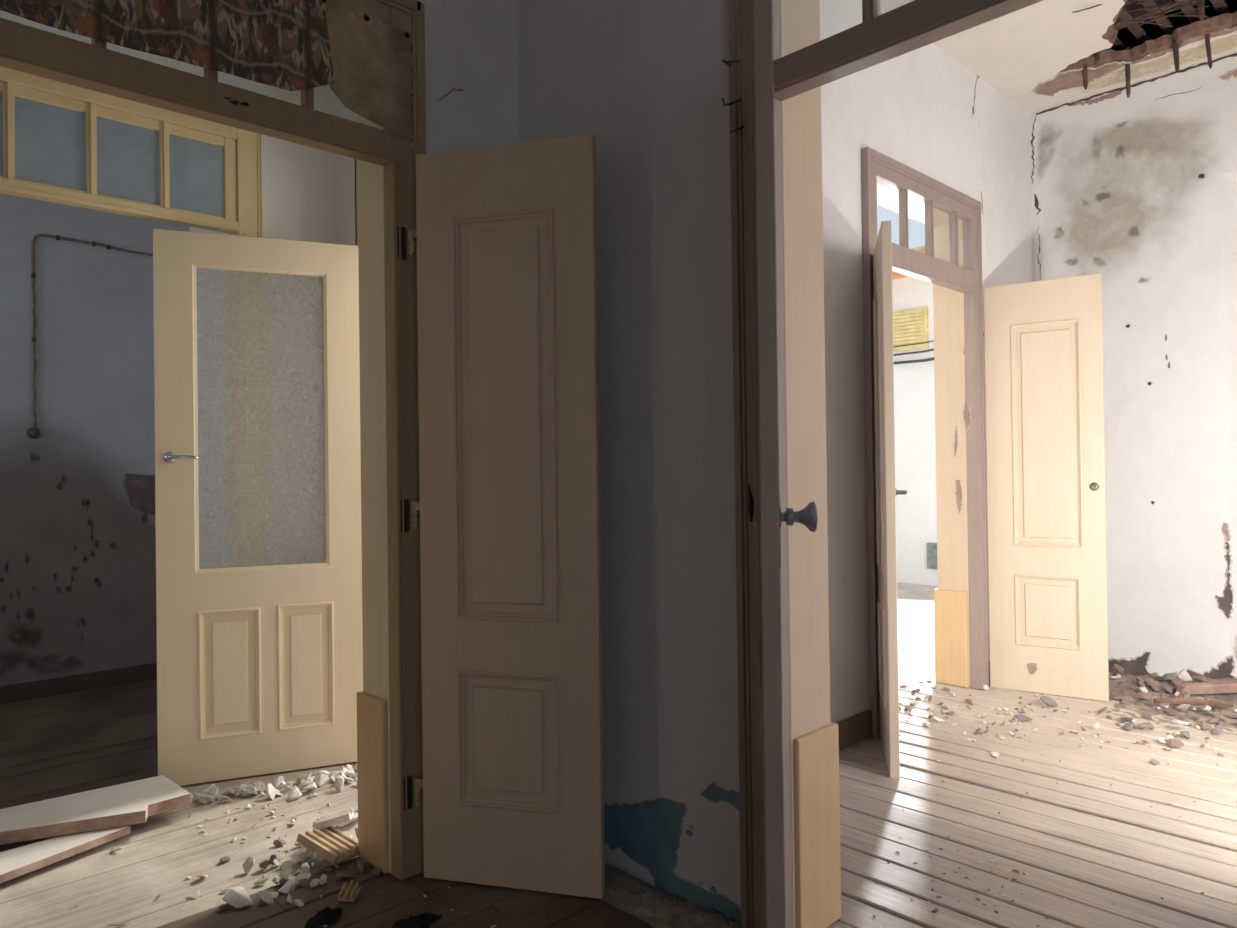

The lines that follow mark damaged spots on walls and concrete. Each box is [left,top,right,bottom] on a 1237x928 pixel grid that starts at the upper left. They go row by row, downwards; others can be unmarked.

spalling [1031,0,1237,106]
crack [1030,53,1237,281]
peeling [125,474,155,513]
damp [0,452,157,686]
flaking render [1214,522,1234,619]
flaking render [1109,651,1158,676]
flaking render [1186,655,1237,679]
peeling [700,782,739,811]
peeling [604,797,742,928]